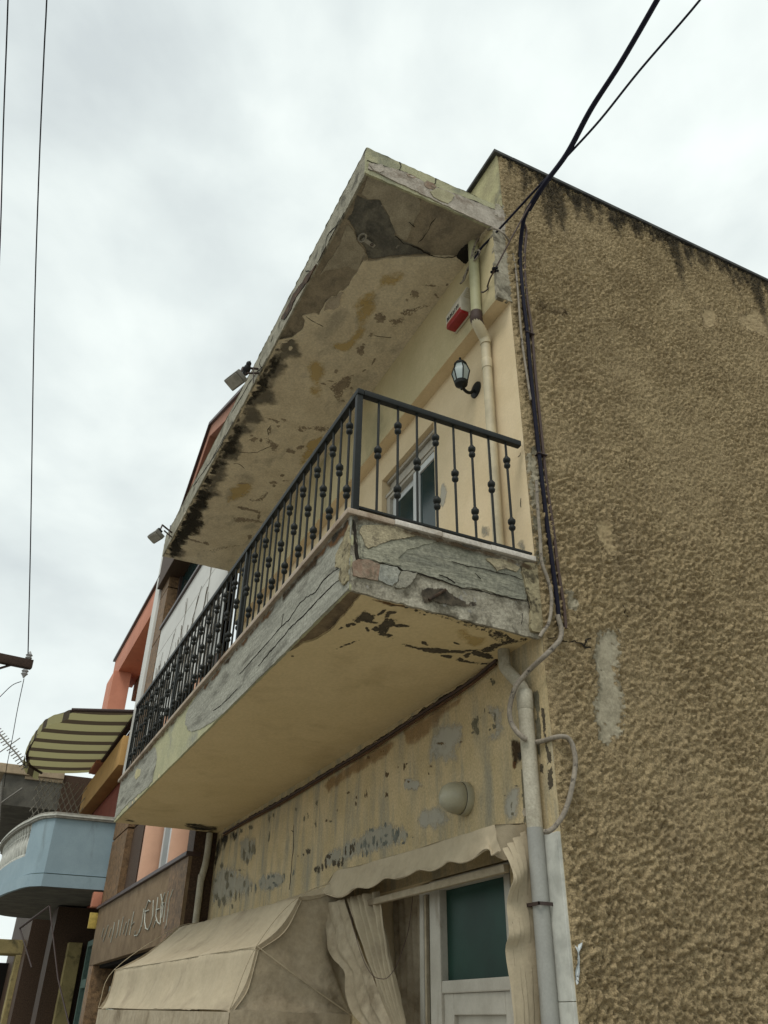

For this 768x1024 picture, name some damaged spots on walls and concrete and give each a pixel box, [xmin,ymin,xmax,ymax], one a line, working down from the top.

flaking render [280,163,506,339]
leakage [553,186,670,241]
peeling [321,284,448,402]
leakage [169,331,300,558]
peeling [185,515,546,732]
crack [213,520,530,711]
peeling [459,708,502,743]
peeling [533,690,553,790]
peeling [213,826,294,909]
peeling [314,822,413,873]